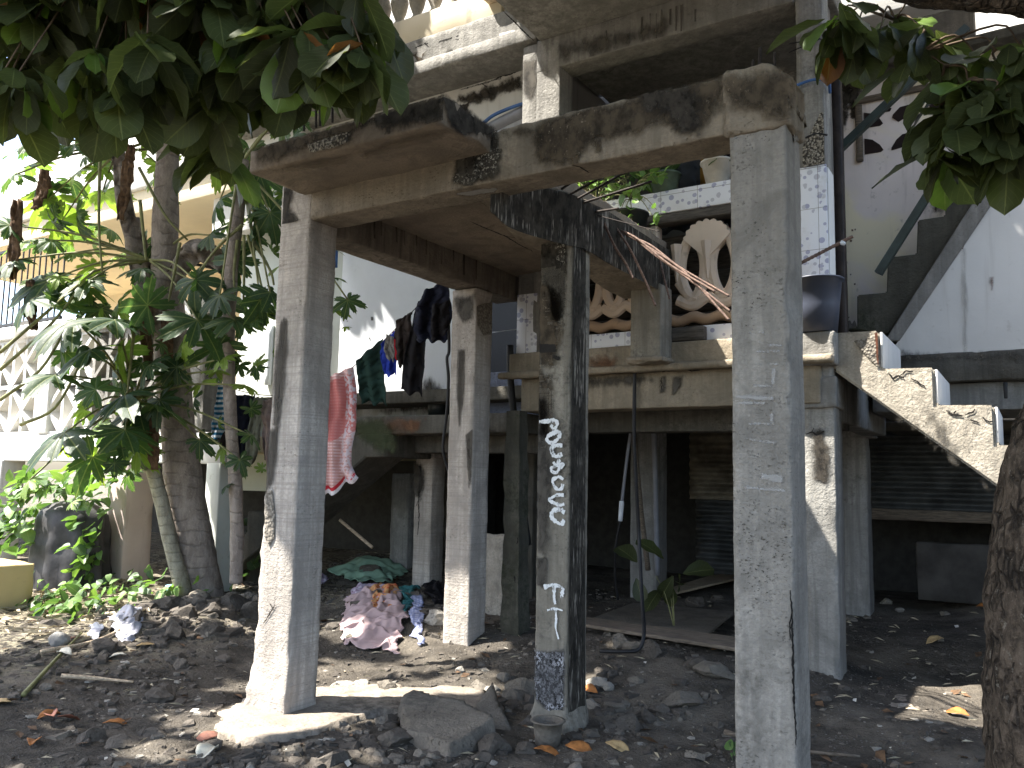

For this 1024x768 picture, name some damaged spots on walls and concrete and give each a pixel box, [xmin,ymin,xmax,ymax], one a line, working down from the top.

spalling [802,112,825,167]
water stain [255,59,796,714]
crack [888,370,925,387]
crack [946,409,993,423]
water stain [812,429,830,483]
crack [789,590,797,745]